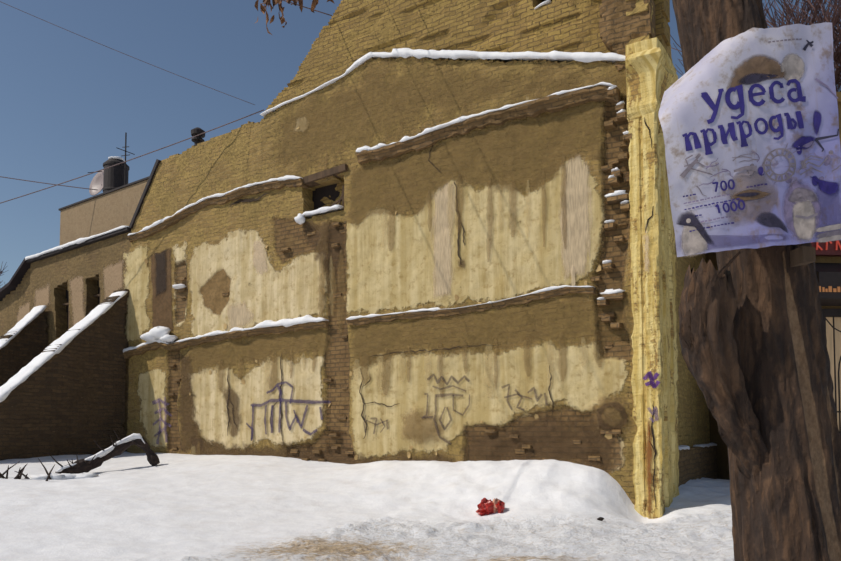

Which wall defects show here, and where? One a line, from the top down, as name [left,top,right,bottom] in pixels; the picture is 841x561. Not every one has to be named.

crack [419,127,465,267]
flaking render [137,98,631,473]
crack [227,368,238,436]
crack [359,344,498,439]
crack [649,401,657,507]